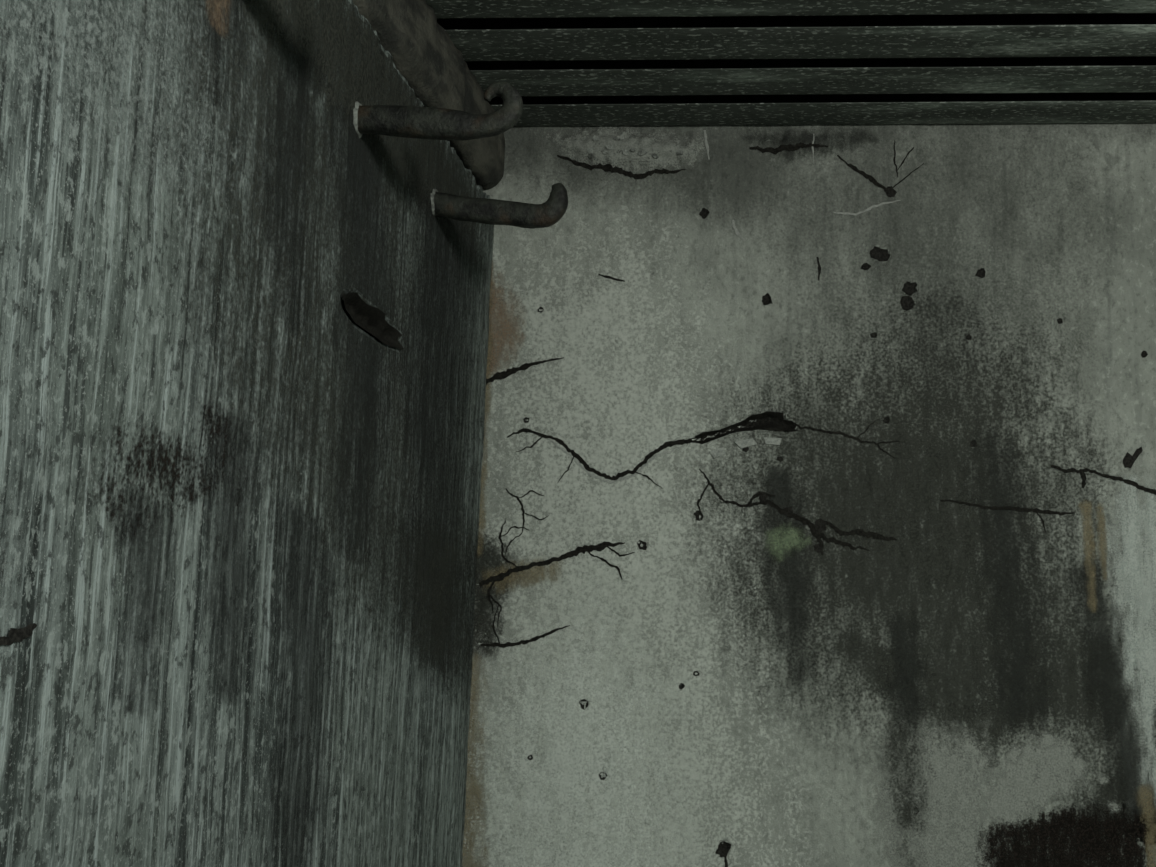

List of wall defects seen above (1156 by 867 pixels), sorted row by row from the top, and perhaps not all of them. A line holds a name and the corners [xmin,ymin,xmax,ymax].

crack [486,357,564,385]
crack [794,418,905,459]
crack [940,465,1156,533]
crack [479,428,897,648]